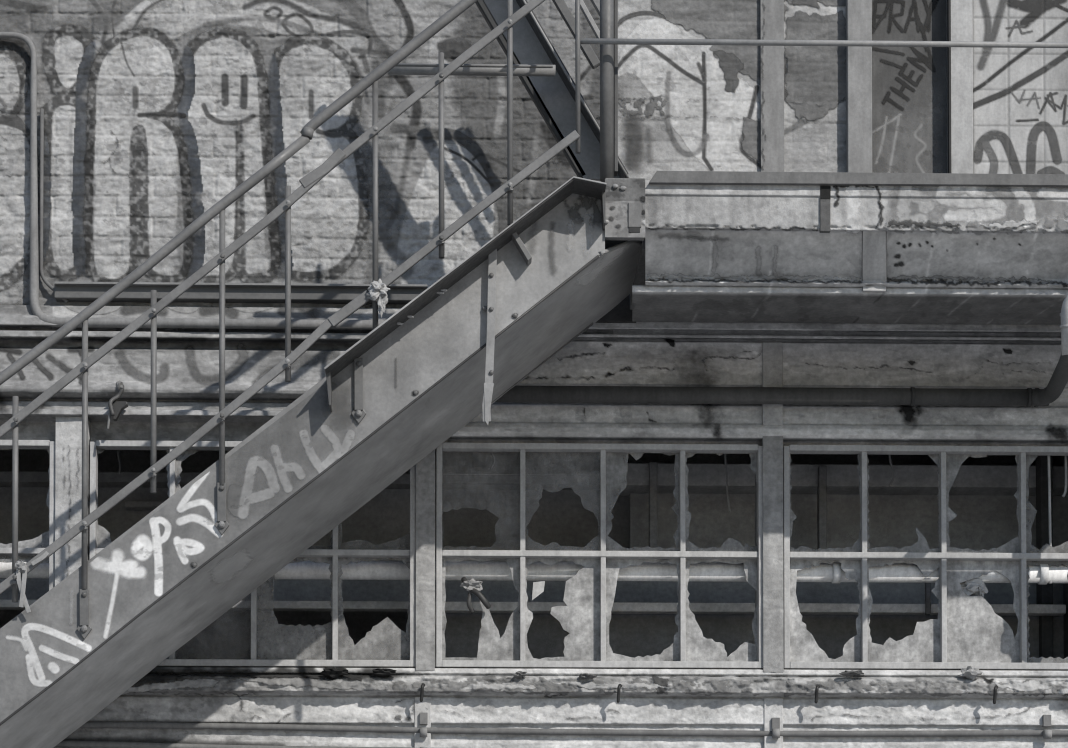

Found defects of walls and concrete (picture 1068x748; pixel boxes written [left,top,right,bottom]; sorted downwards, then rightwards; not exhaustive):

crack [833,186,884,227]
peeling [122,672,756,696]
peeling [784,678,1067,697]